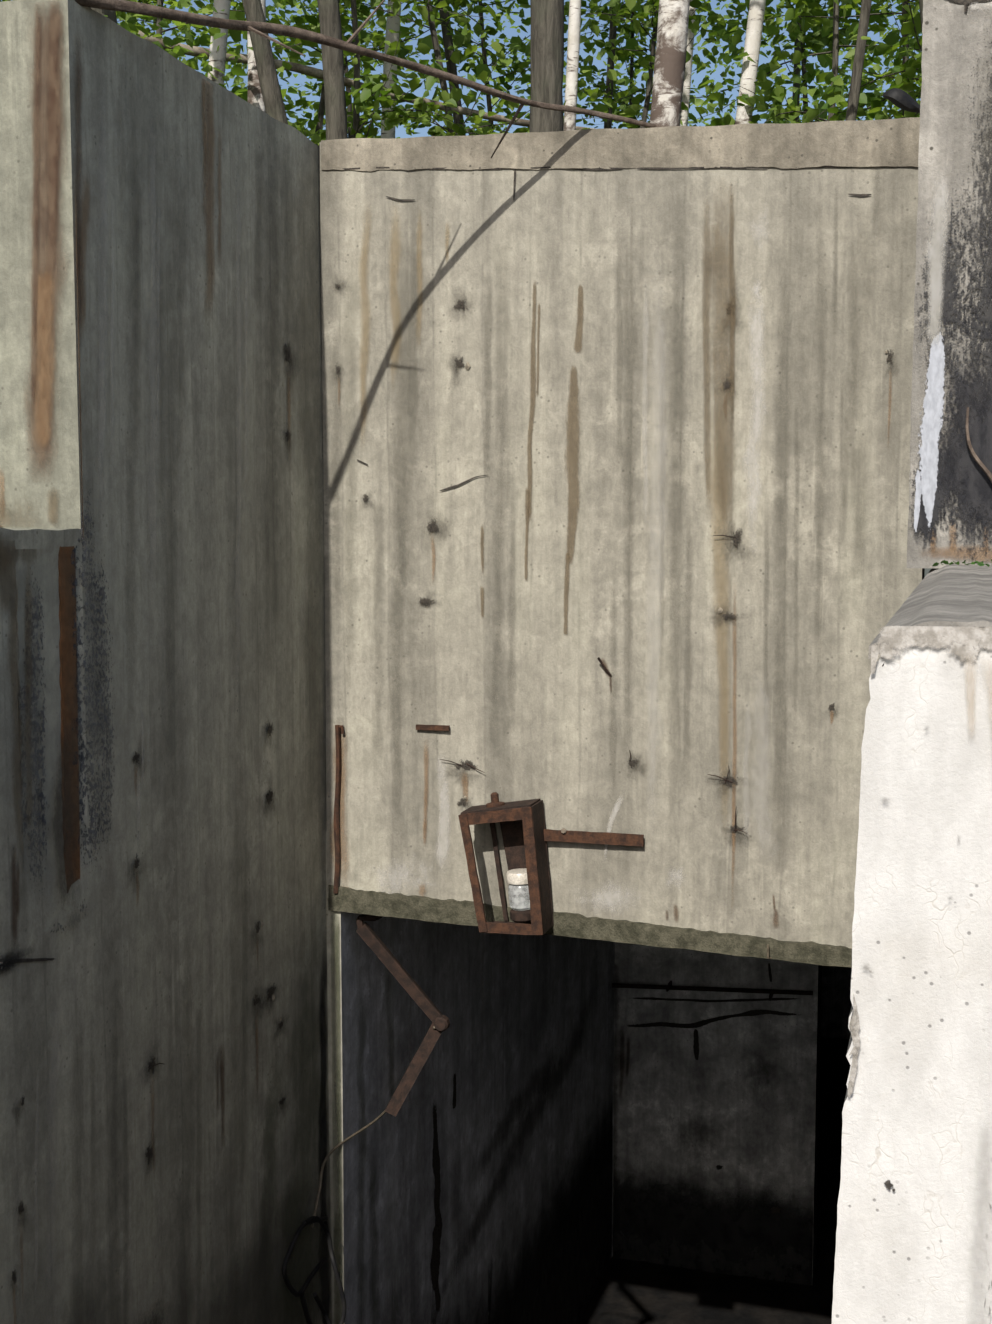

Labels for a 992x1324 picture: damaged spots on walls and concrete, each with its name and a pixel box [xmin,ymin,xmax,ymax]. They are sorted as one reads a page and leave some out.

corrosion [31,9,61,464]
corrosion [76,52,84,539]
spalling [871,626,992,675]
crack [430,1074,456,1312]